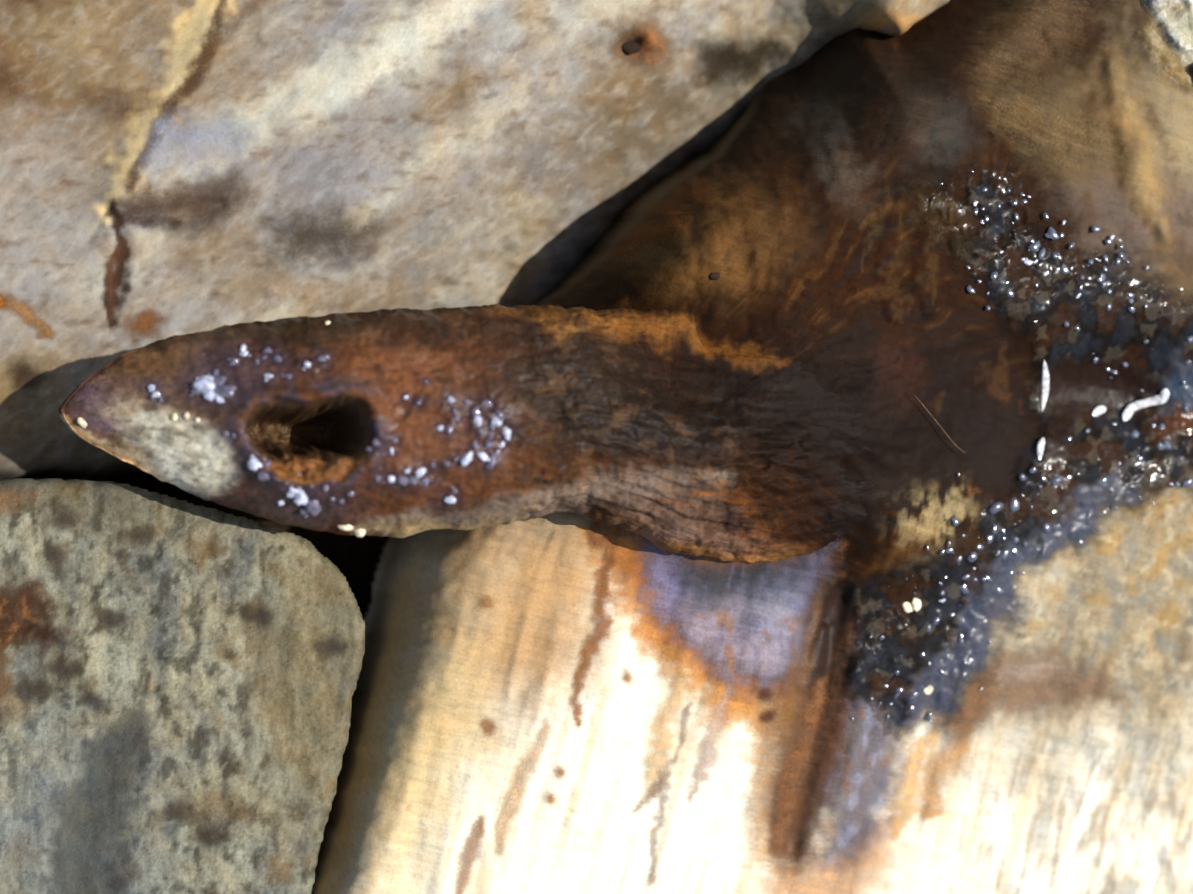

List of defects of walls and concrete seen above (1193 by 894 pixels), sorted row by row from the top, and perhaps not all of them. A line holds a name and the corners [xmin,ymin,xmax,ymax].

corrosion [129,311,163,339]
crack [103,0,238,327]
water stain [551,0,1137,894]